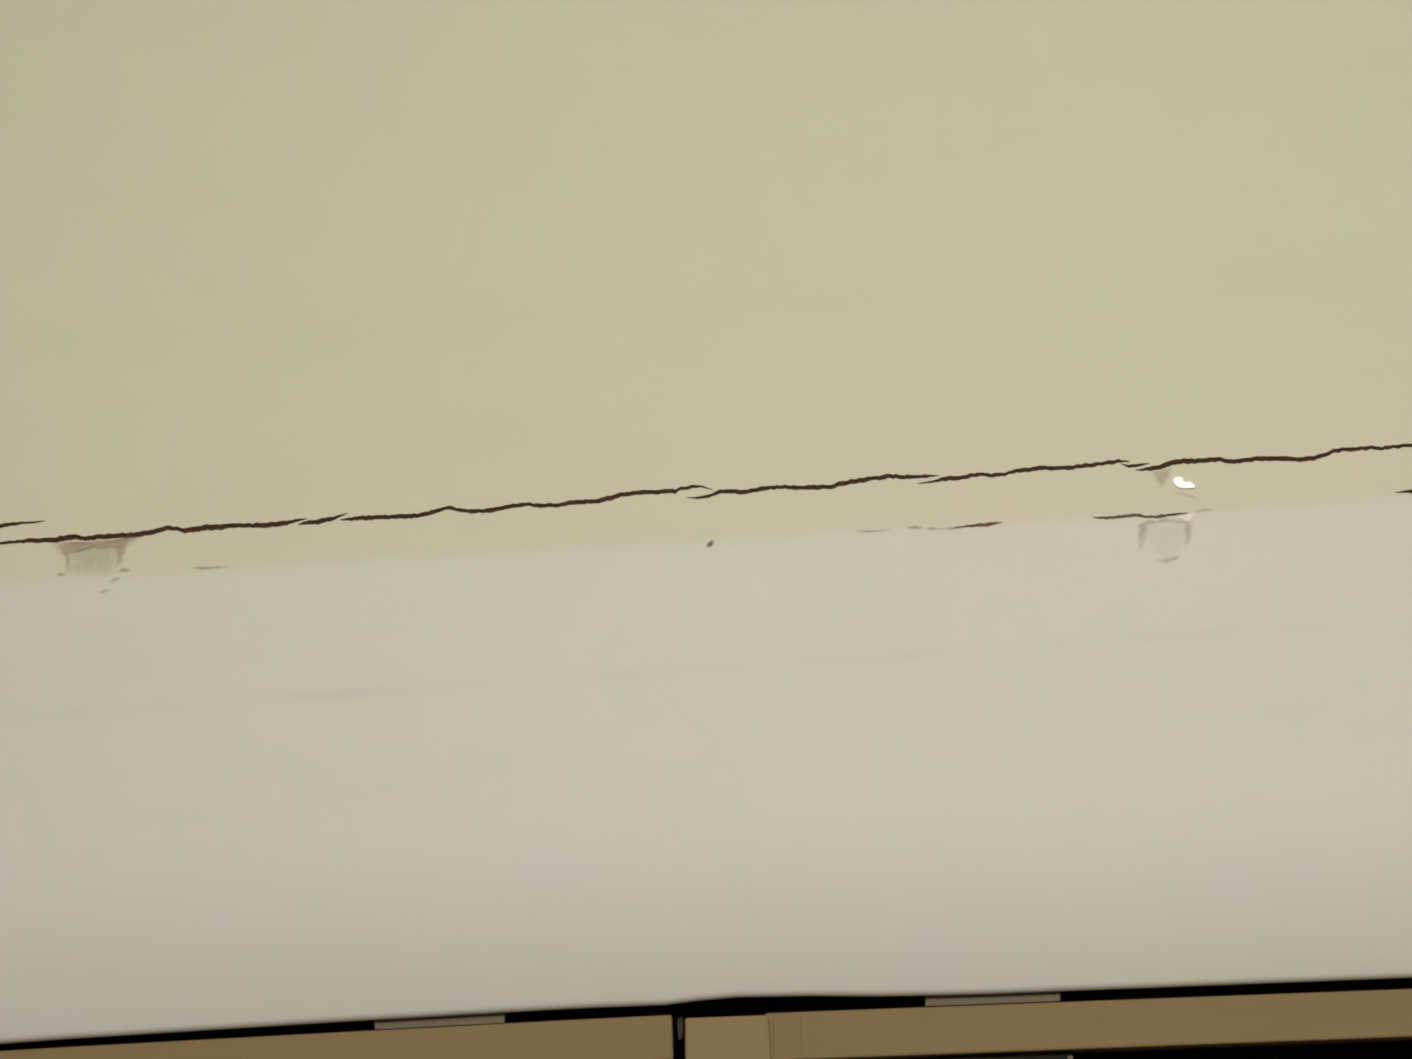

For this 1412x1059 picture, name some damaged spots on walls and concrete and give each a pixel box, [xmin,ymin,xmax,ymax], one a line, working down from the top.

crack [0,444,1412,544]
water stain [68,539,126,552]